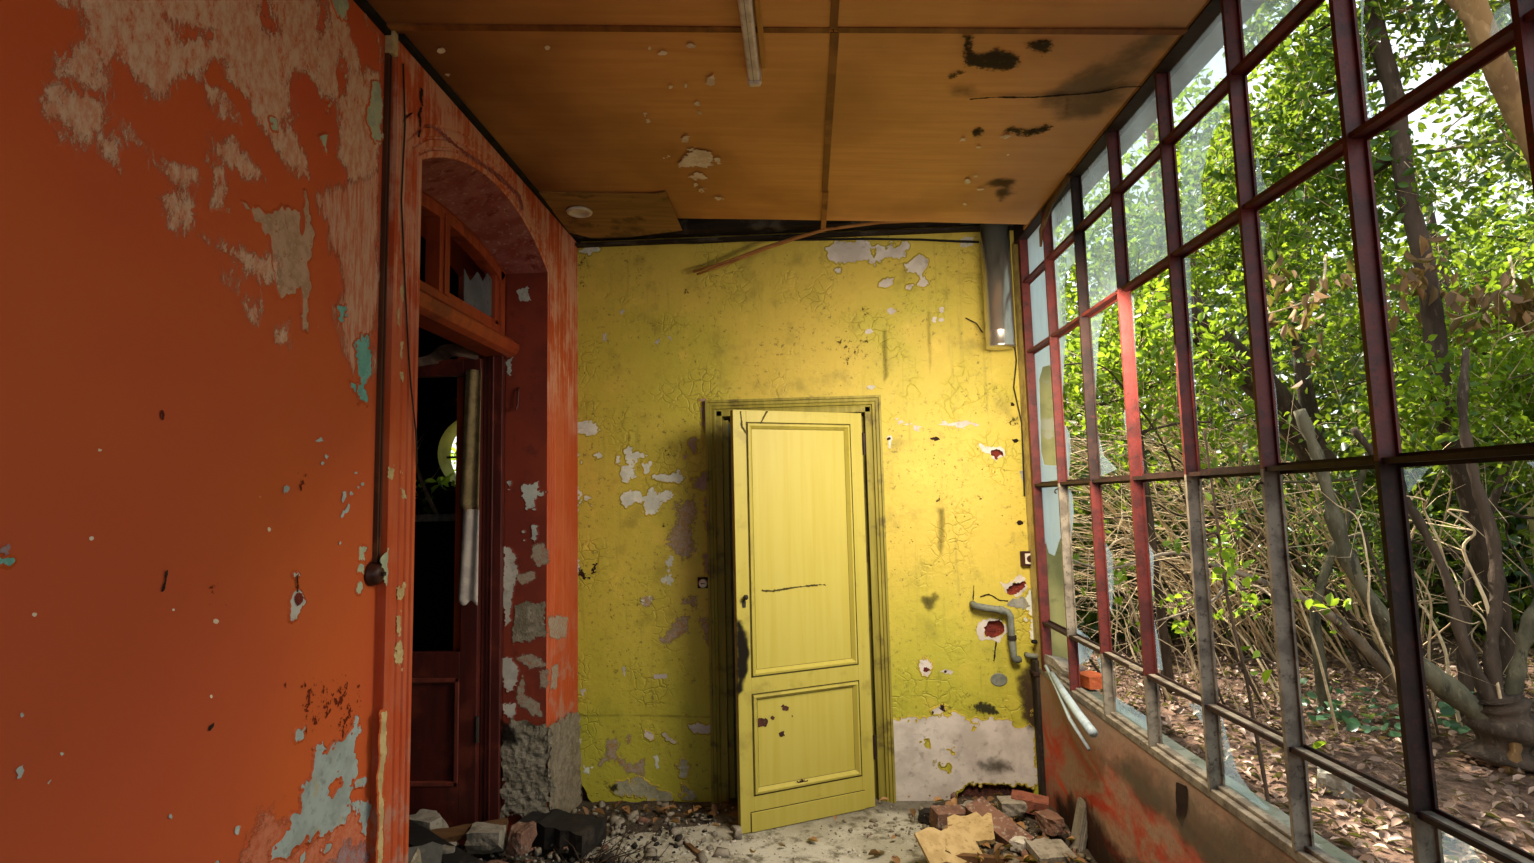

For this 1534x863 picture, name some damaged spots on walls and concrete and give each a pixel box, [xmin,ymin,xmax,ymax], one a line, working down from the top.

leakage [948,35,1053,79]
leakage [1054,35,1166,116]
leakage [1004,124,1053,137]
peeling [39,0,384,408]
peeling [824,237,930,291]
peeling [838,307,896,365]
peeling [503,480,549,628]
peeling [578,396,709,646]
peeling [548,615,568,640]
peeling [235,675,388,863]
flaking render [500,653,710,819]
peeling [893,703,1038,801]